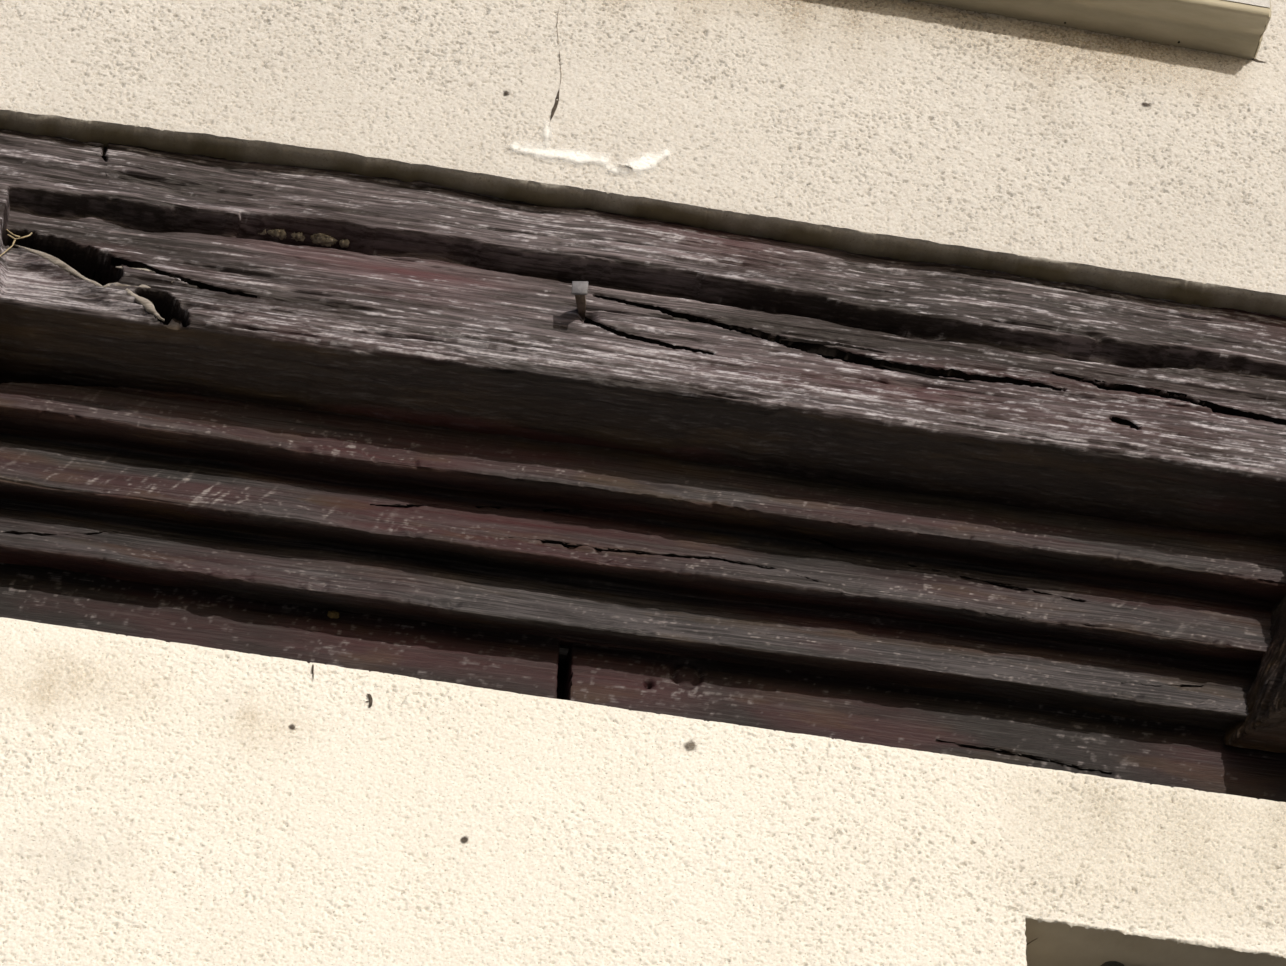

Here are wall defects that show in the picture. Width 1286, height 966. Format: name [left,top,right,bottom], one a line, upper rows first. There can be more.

crack [545,6,562,148]
crack [110,257,257,298]
crack [584,295,1286,430]
crack [370,504,818,582]
crack [807,537,1089,602]